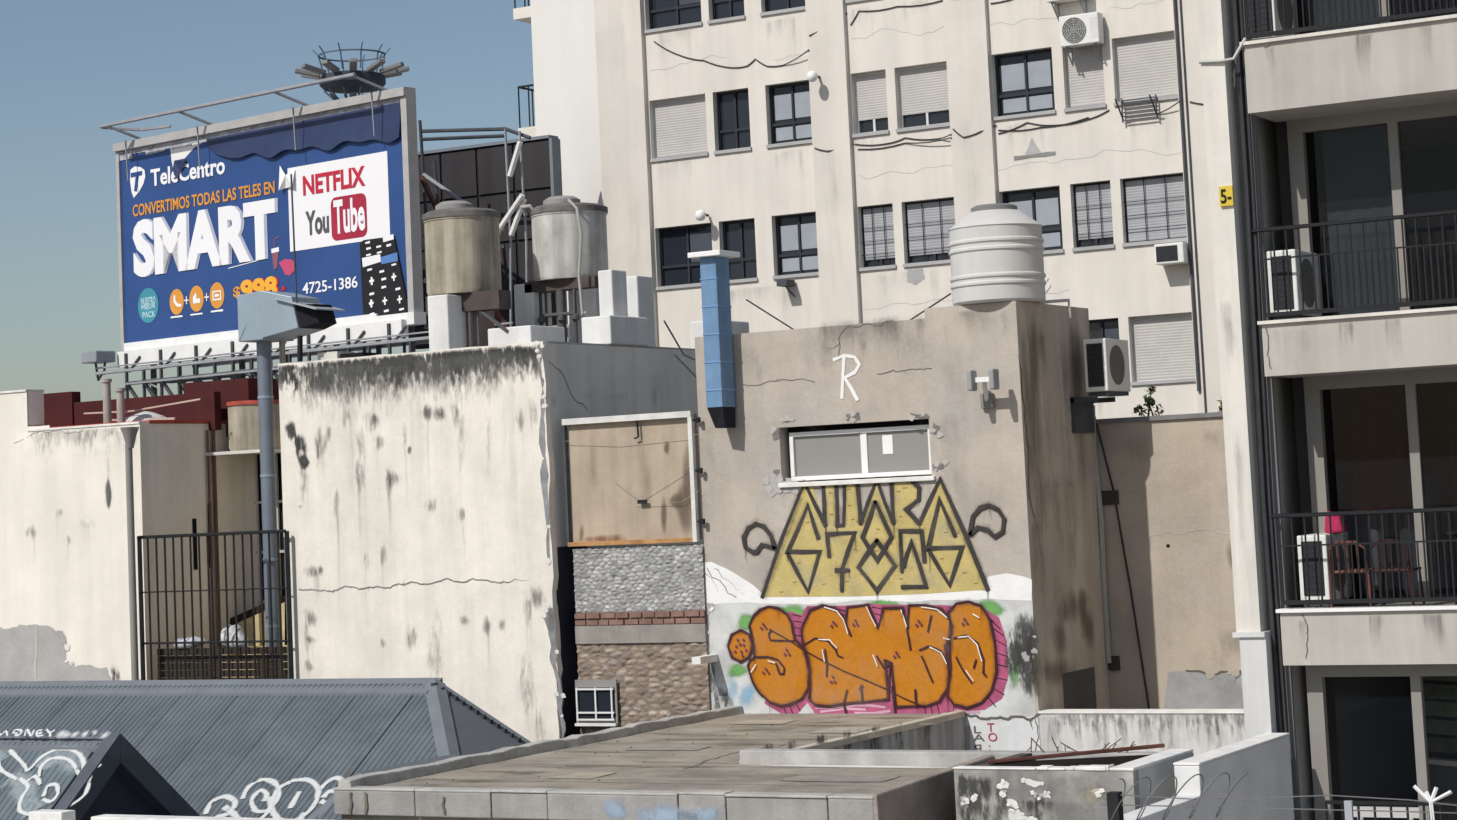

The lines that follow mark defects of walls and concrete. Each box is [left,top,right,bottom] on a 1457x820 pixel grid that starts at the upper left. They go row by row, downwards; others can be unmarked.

damp [277,346,539,389]
damp [286,422,320,469]
crack [299,578,524,592]
peeling [0,624,112,681]
spalling [1165,669,1244,709]